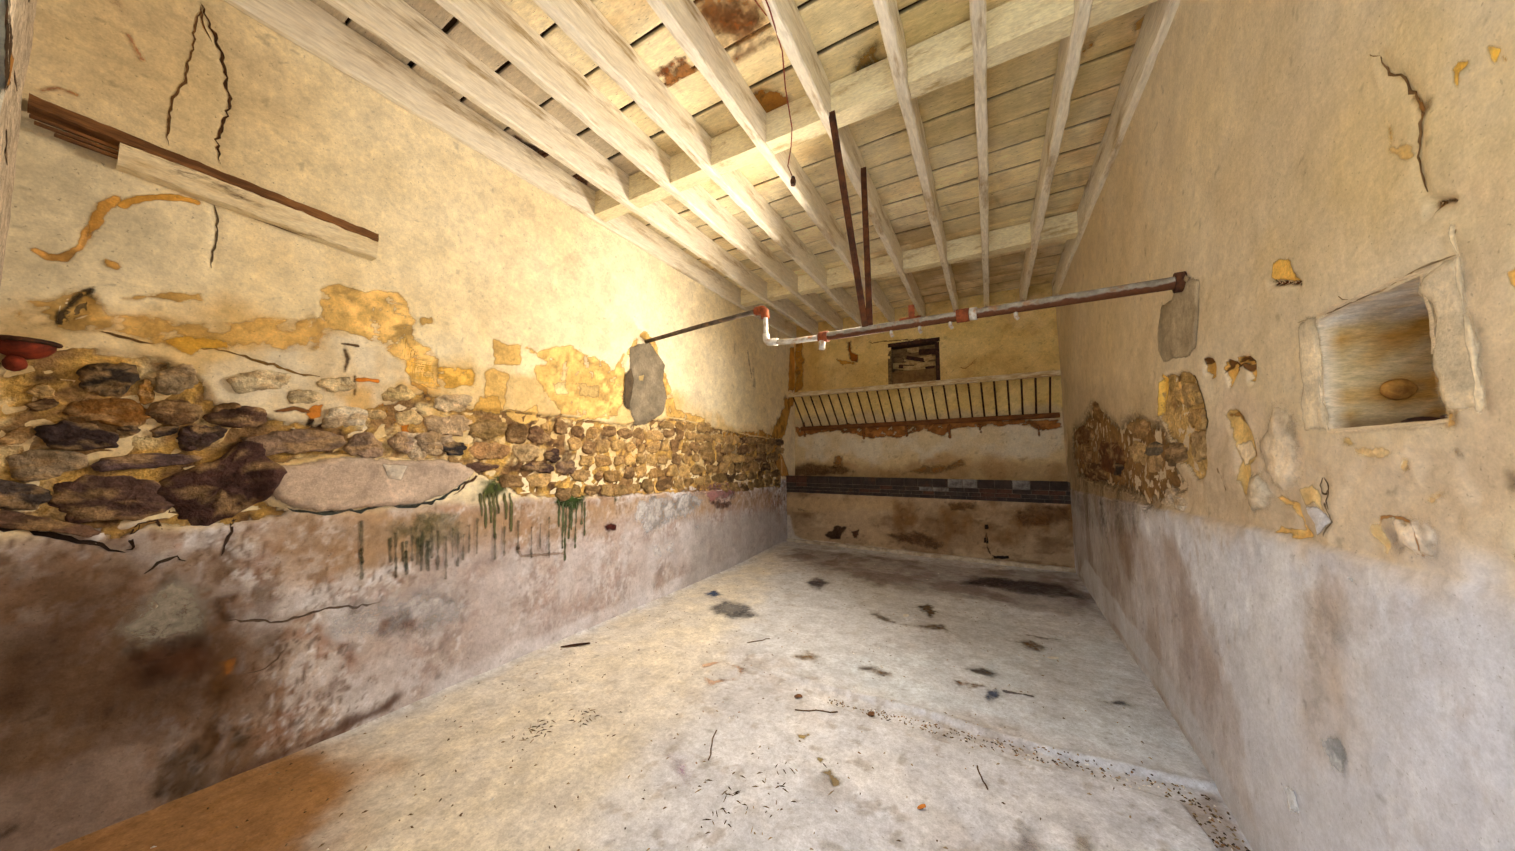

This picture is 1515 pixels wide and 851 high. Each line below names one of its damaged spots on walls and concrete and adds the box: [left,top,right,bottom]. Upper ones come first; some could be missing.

crack [166,4,233,164]
rust [657,57,696,86]
crack [1370,55,1428,192]
peeling [31,194,200,262]
crack [210,205,219,268]
spalling [1272,259,1302,286]
spalling [0,284,1257,539]
crack [287,468,522,516]
spalling [1276,485,1332,539]
water stain [126,582,207,684]